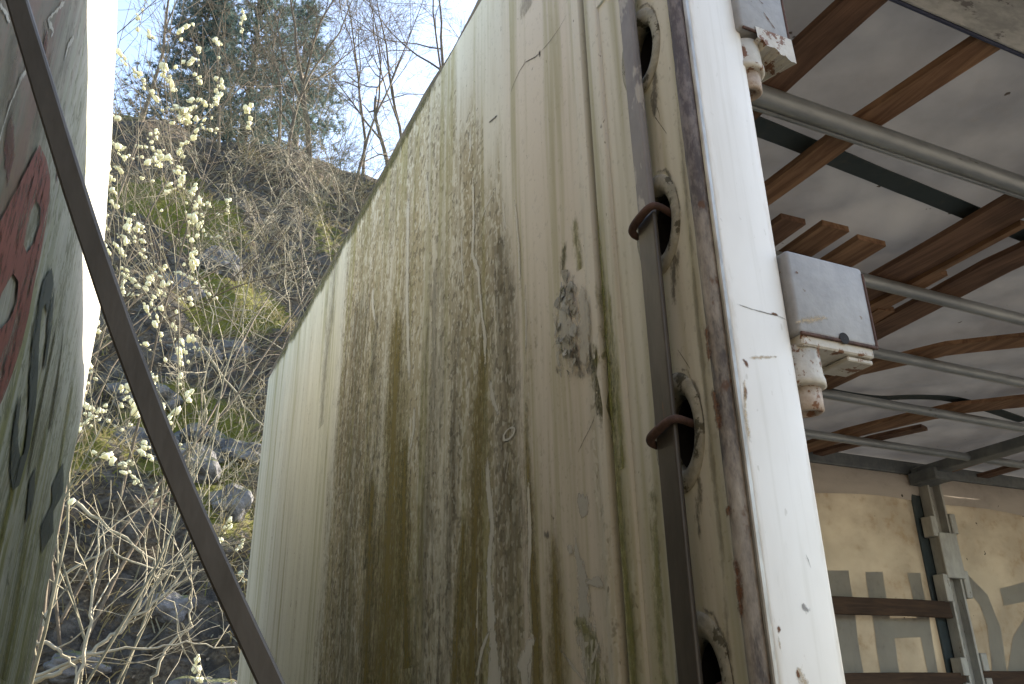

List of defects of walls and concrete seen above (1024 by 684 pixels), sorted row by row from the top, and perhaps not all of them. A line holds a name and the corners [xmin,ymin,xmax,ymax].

corrosion [759,0,790,39]
damp [461,175,521,364]
damp [562,223,581,270]
spalling [552,270,607,377]
damp [360,482,376,684]
damp [400,409,415,669]
damp [451,522,464,684]
damp [476,457,501,684]
damp [517,483,534,684]
damp [549,545,564,684]